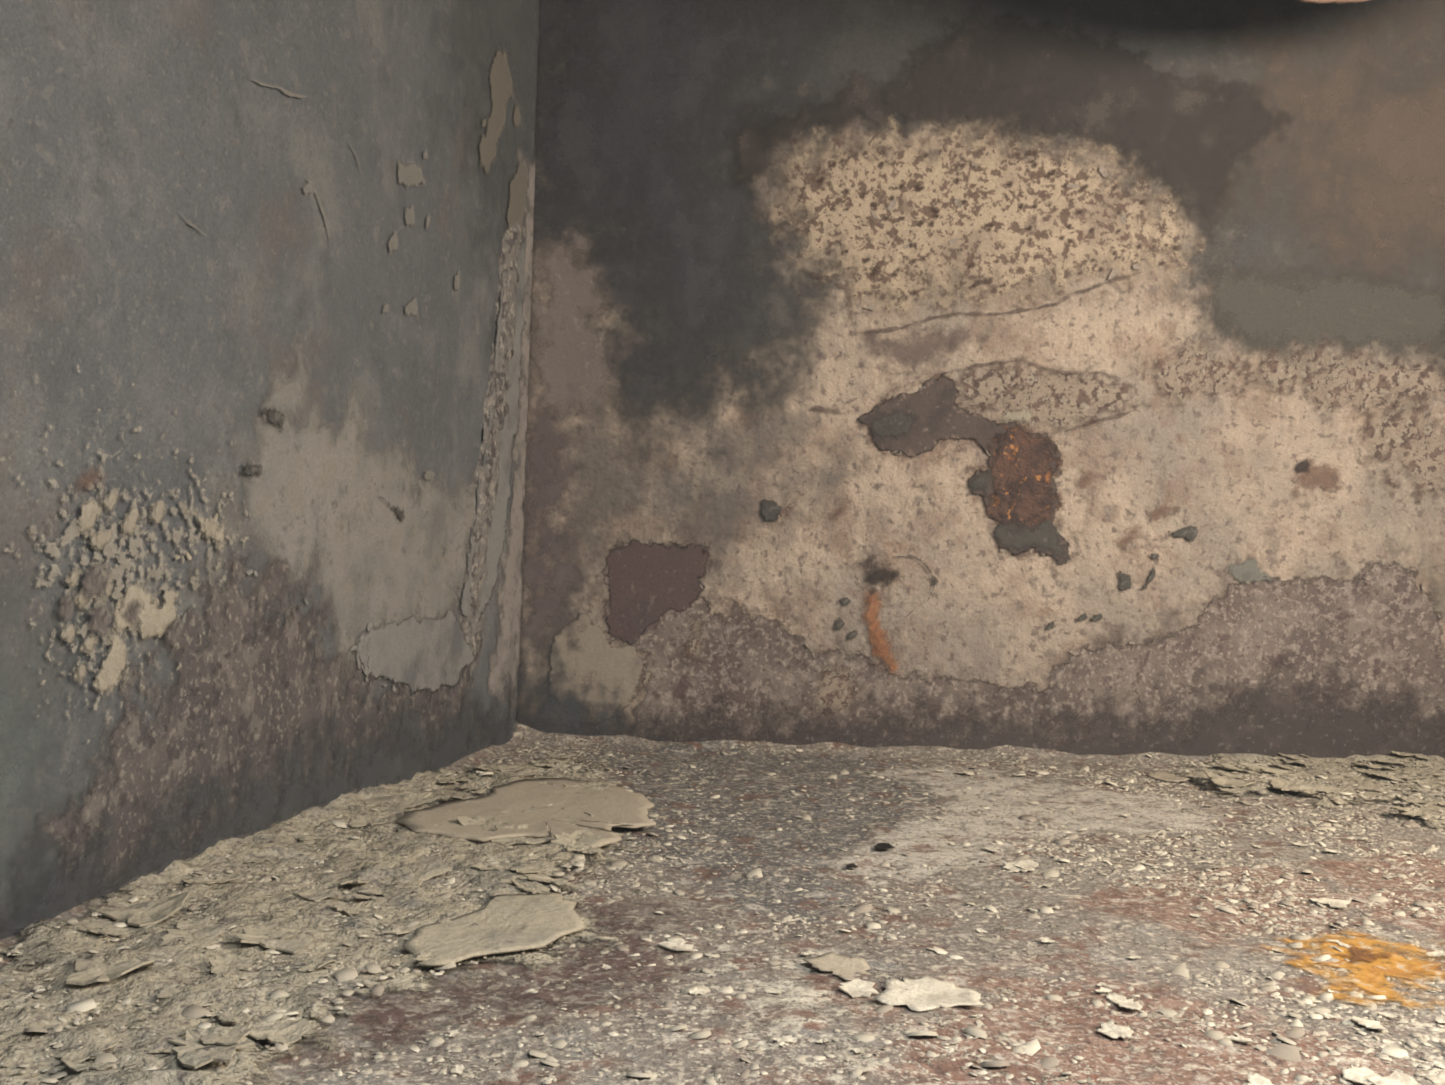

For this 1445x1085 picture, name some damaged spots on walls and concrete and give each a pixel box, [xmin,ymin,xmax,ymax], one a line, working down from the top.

damp [728,14,1282,230]
damp [866,330,987,367]
crack [803,270,1139,333]
peeling [0,151,692,1085]
rust [860,555,899,671]
peeling [548,539,1445,828]
rust [1266,930,1445,1008]